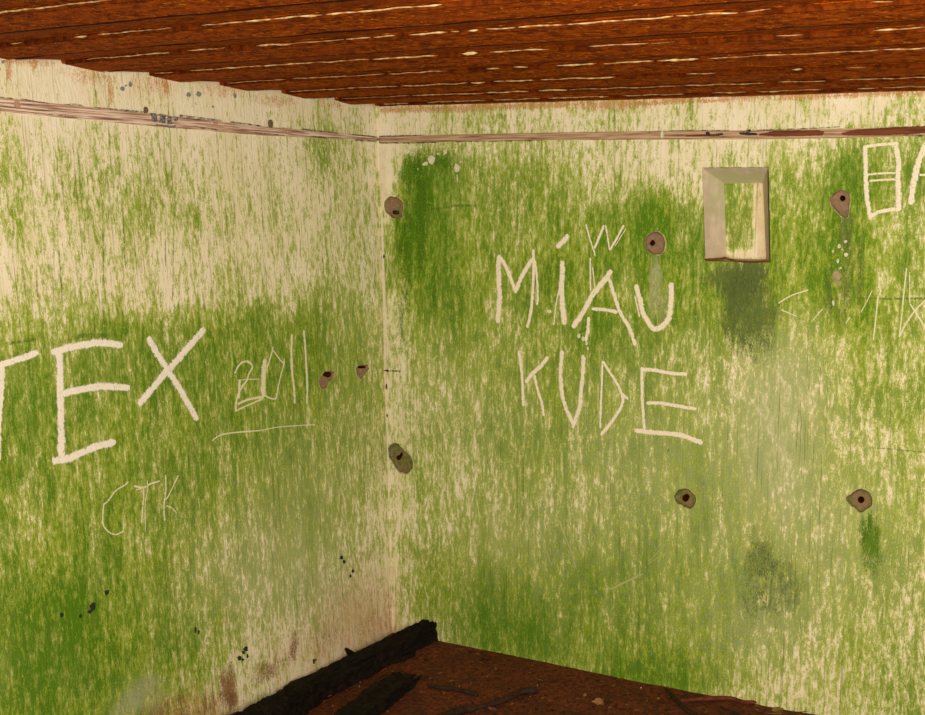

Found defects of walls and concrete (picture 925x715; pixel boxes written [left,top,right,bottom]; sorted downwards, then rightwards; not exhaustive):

water stain [149,113,178,127]
water stain [710,262,776,347]
water stain [861,515,879,572]